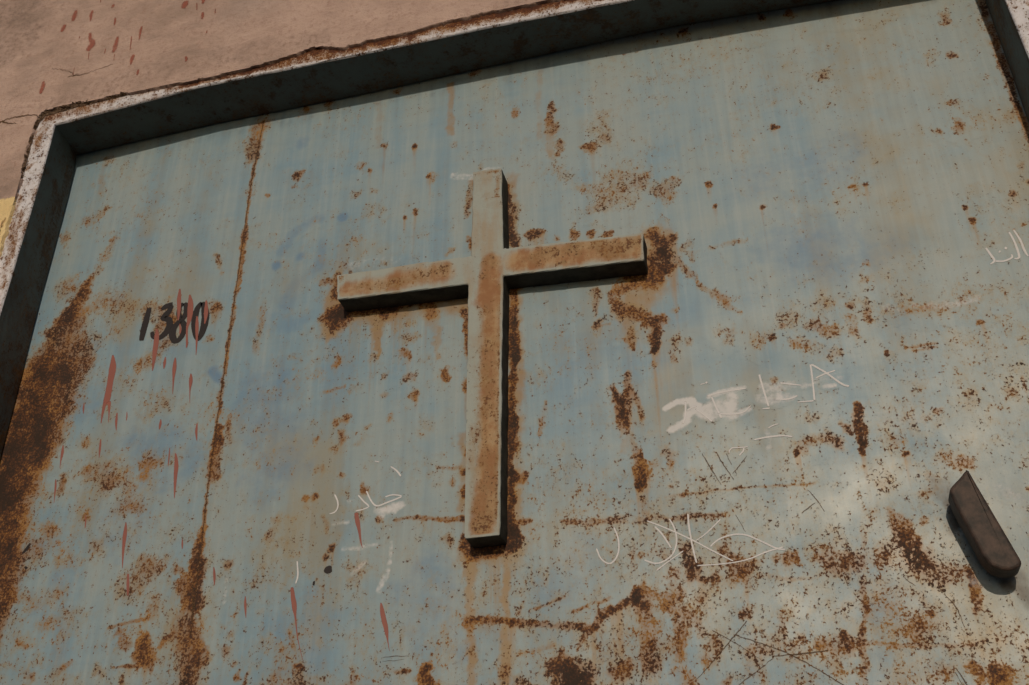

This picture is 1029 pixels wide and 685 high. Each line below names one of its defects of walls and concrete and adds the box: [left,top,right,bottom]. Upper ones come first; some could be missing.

rust [0,113,381,685]
rust [23,0,620,181]
rust [307,97,1029,685]
rust [910,0,1029,241]